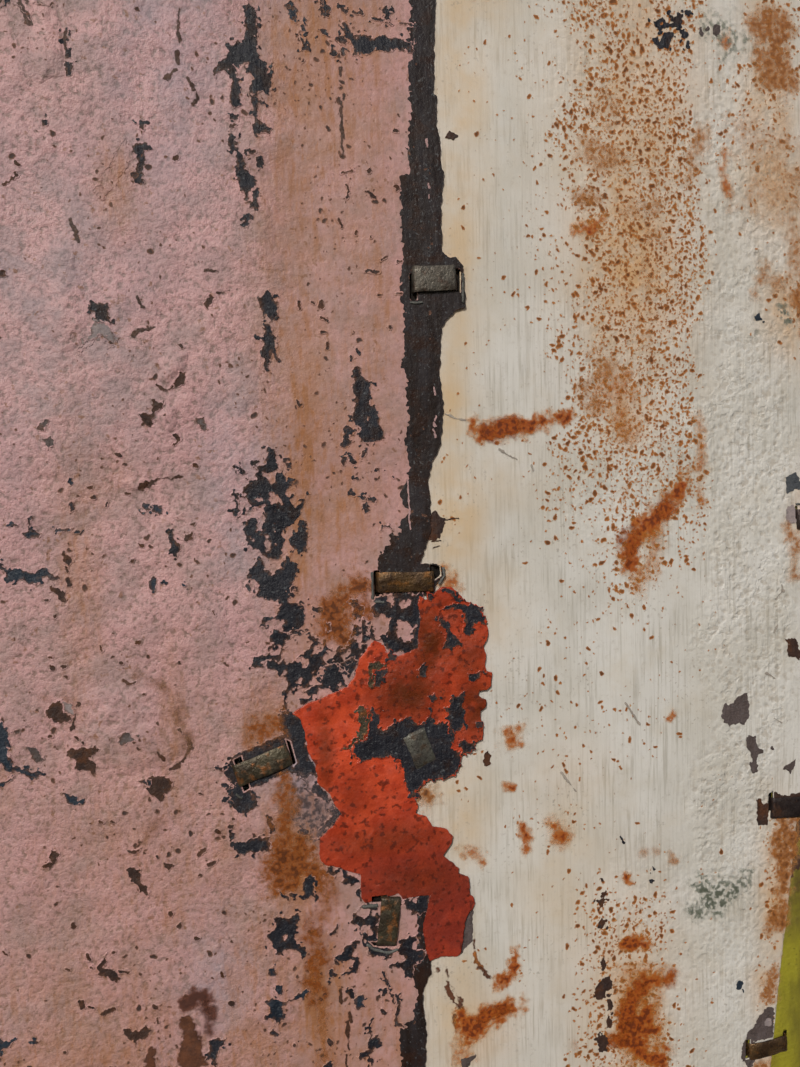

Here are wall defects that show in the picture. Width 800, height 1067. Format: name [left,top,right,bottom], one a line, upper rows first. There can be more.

peeling [212,0,276,229]
peeling [296,299,331,351]
corrosion [457,0,800,639]
peeling [339,346,386,514]
corrosion [317,576,373,647]
peeling [213,445,491,859]
peeling [0,1037,41,1062]
peeling [196,847,219,878]
corrosion [263,772,337,902]
corrosion [453,947,527,1063]
corrosion [562,868,707,1067]
corrosion [756,817,800,1005]